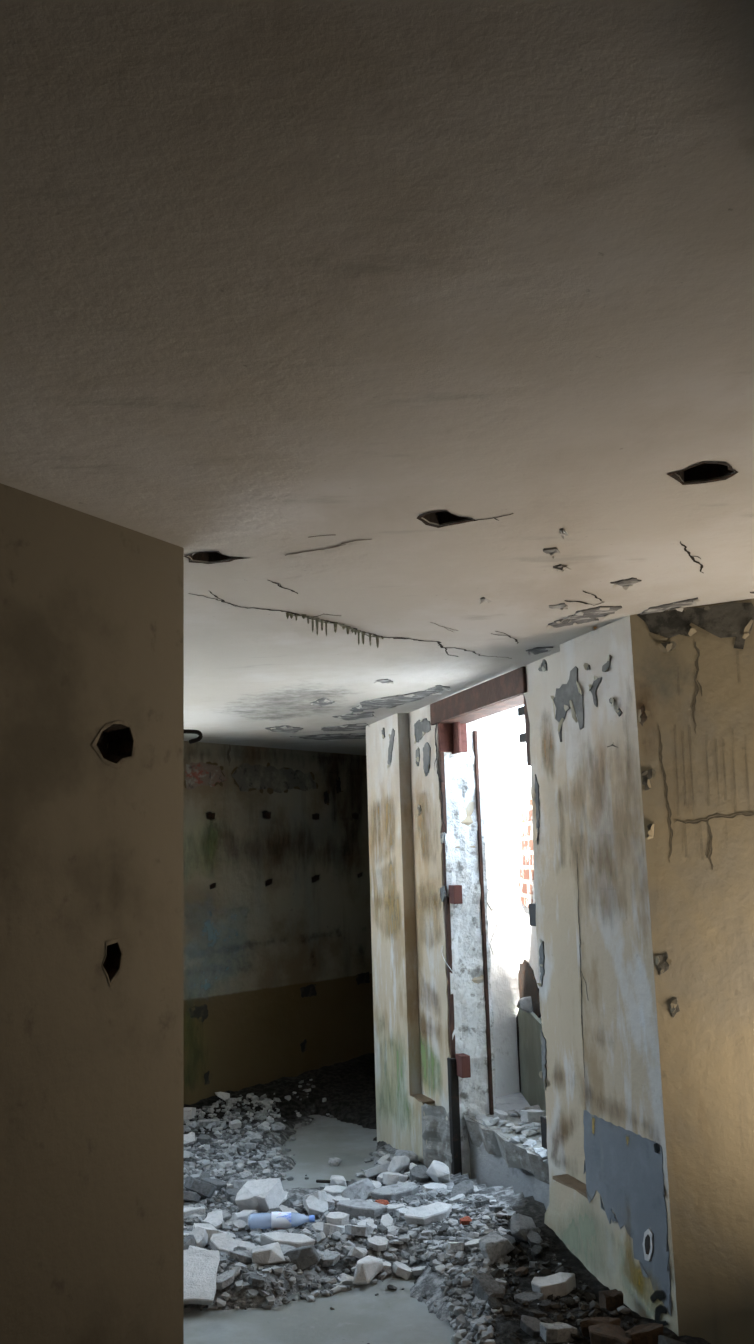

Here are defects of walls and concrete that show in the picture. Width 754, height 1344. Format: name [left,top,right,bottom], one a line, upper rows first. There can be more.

crack [188,535,519,659]
flaking render [265,679,451,776]
flaking render [526,647,553,671]
flaking render [547,603,622,629]
flaking render [551,655,650,742]
flaking render [610,577,641,590]
flaking render [637,592,754,653]
crack [691,642,702,733]
flaking render [641,769,656,791]
crack [658,725,754,870]
water stain [226,759,400,935]
peeling [583,1110,672,1316]